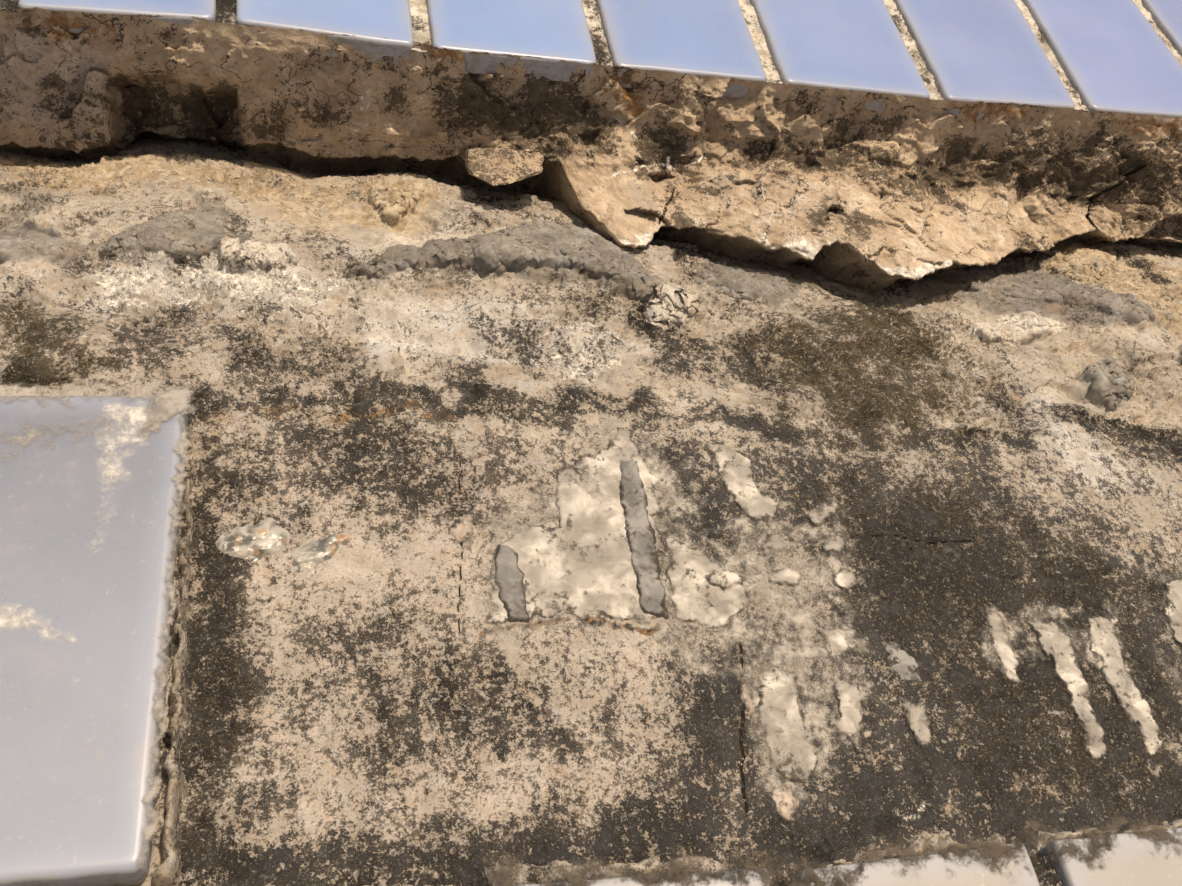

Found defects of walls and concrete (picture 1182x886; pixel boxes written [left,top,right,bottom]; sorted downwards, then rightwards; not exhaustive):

spalling [0,7,1182,451]
crack [1085,164,1147,230]
damp [0,299,262,864]
peeling [132,557,181,886]
peeling [177,392,1182,886]
damp [733,289,1182,818]